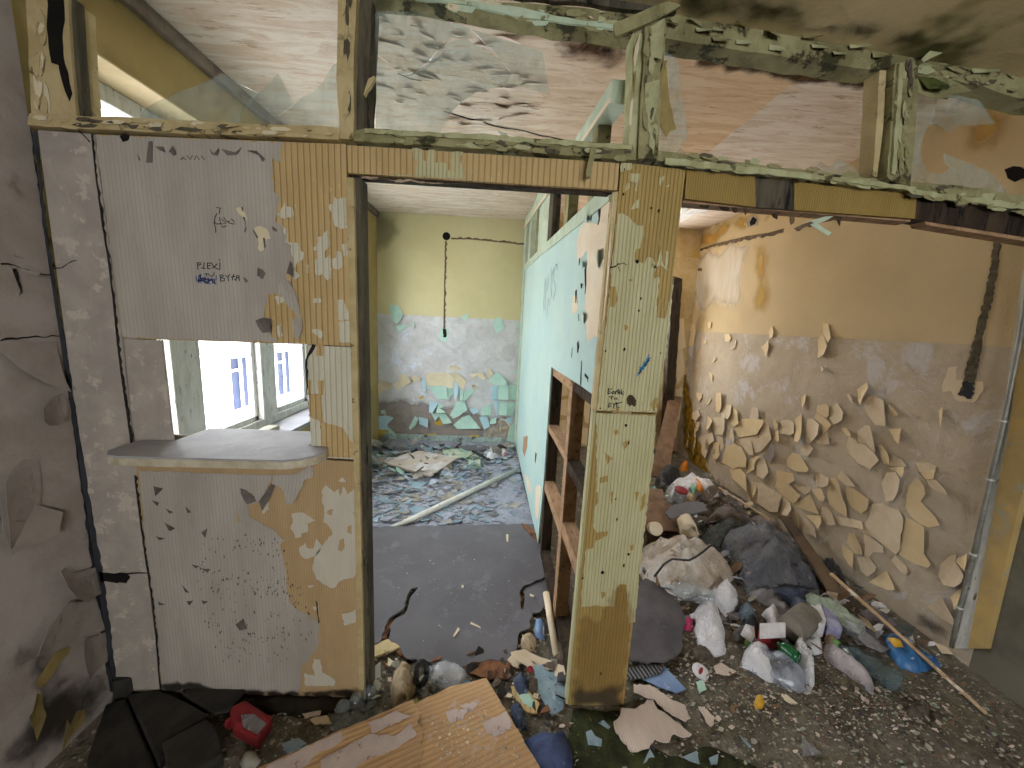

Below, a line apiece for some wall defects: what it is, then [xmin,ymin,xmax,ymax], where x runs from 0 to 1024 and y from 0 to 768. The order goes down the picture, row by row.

water stain [752,5,793,18]
peeling [32,9,334,342]
peeling [671,153,883,190]
peeling [897,57,1020,176]
peeling [907,185,1024,216]
crack [0,128,162,692]
peeling [378,366,537,463]
spalling [525,475,542,520]
peeling [660,318,967,625]
peeling [942,366,983,403]
peeling [139,466,319,693]
peeling [29,567,108,740]